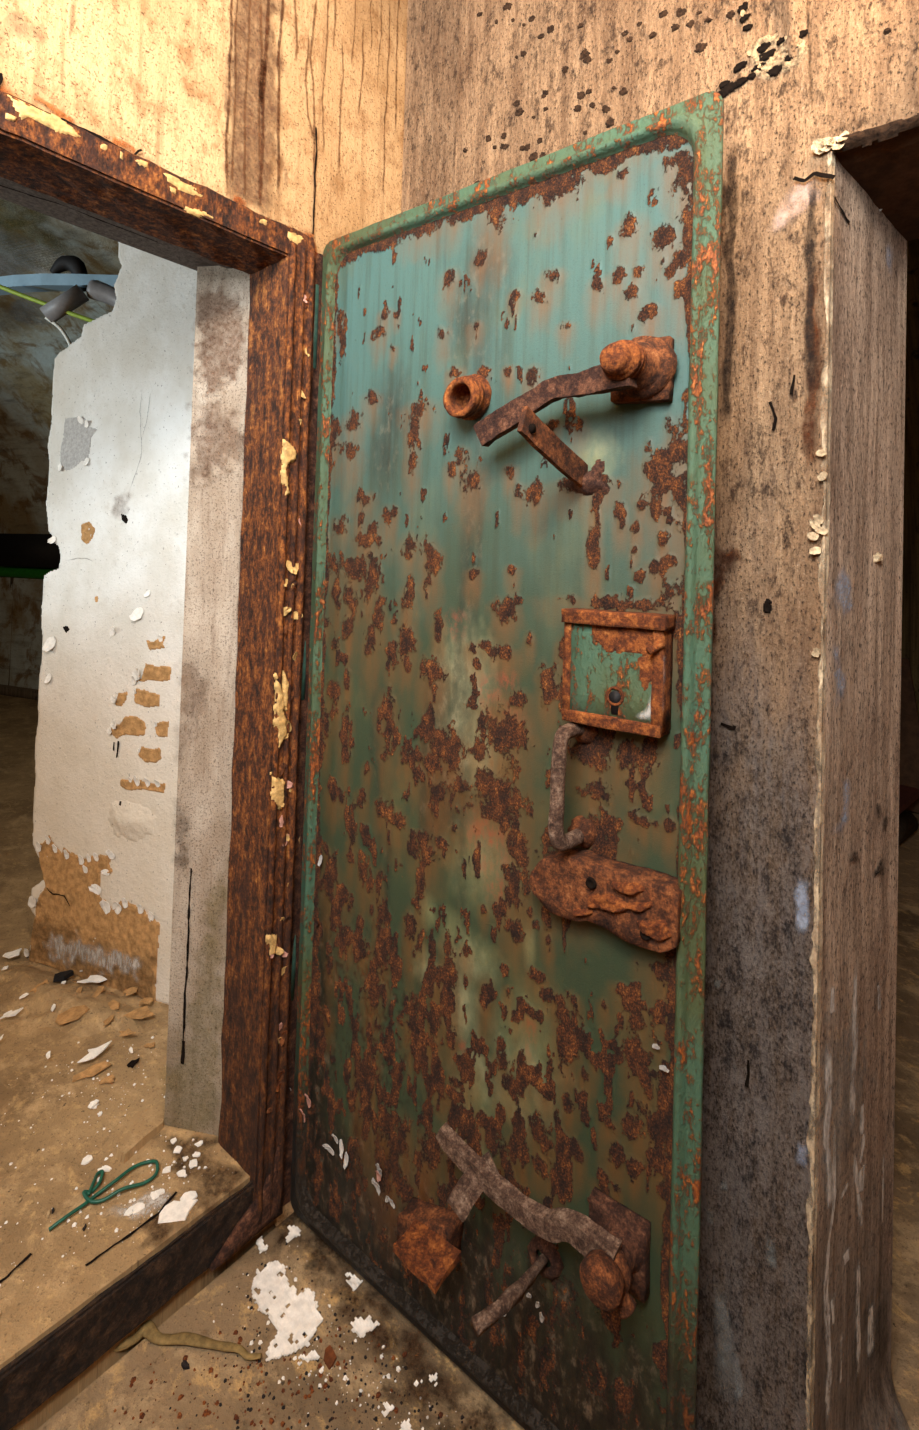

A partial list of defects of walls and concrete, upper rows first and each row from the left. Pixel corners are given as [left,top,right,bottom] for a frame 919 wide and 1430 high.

spalling [477,2,554,39]
spalling [562,1,811,98]
rust [35,96,73,123]
water stain [225,0,400,205]
spalling [573,86,628,128]
spalling [486,132,546,162]
rust [590,625,653,691]
peeling [107,635,171,793]
peeling [24,835,160,1002]
rust [169,1140,241,1196]
rust [118,1195,168,1240]
rust [299,1238,496,1430]